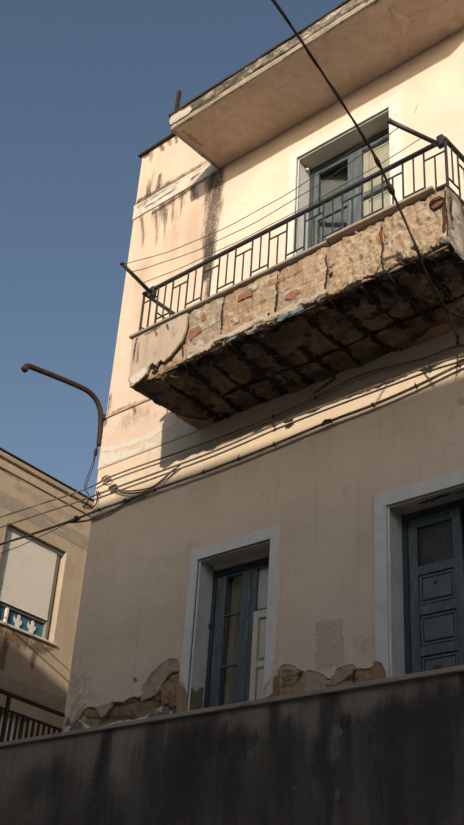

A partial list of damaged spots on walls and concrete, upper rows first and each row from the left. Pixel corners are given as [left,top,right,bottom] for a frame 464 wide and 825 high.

leakage [136,163,224,298]
spalling [98,186,464,468]
spalling [63,658,204,732]
spalling [266,661,386,698]
leakage [313,672,464,825]